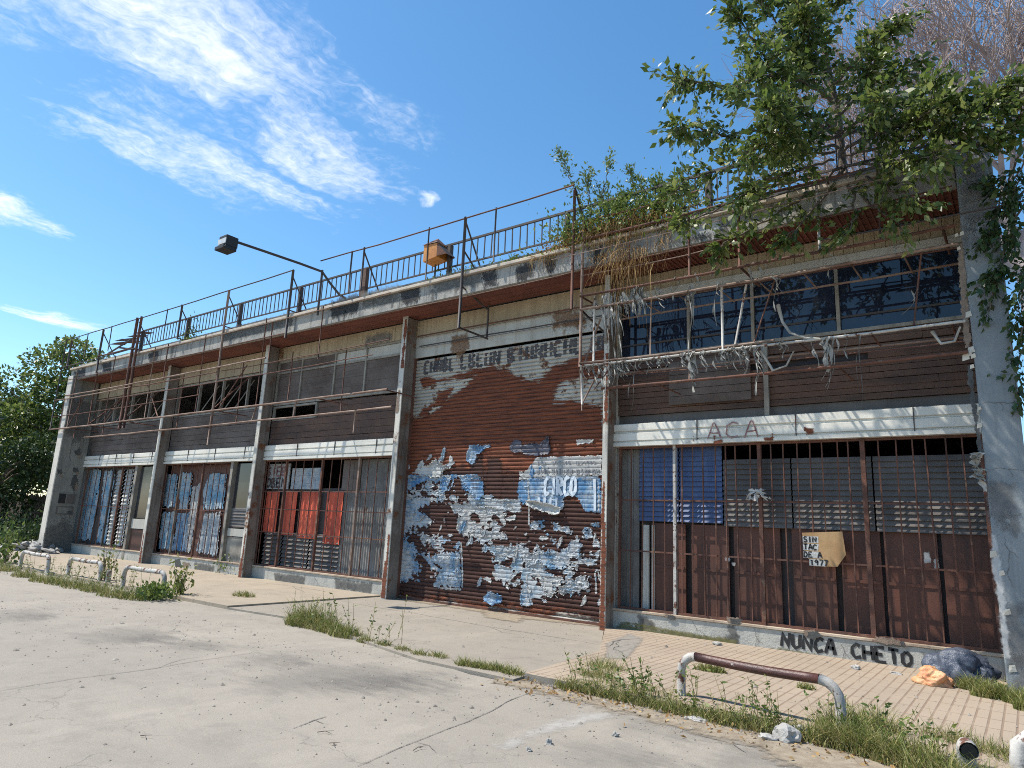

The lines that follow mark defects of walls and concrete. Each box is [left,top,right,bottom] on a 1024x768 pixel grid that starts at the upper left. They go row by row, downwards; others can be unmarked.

rust [399,335,606,631]